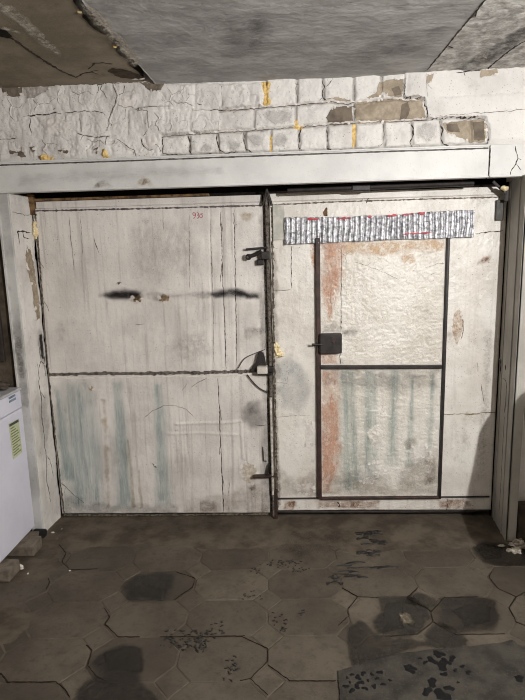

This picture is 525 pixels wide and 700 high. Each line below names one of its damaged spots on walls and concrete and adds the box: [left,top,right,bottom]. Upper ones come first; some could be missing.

crack [0,0,525,176]
flaking render [326,78,427,126]
flaking render [443,119,489,144]
crack [182,379,229,512]
water stain [473,542,525,566]
crack [104,608,140,638]
water stain [349,593,498,666]
crack [86,645,104,680]
crack [160,635,336,695]